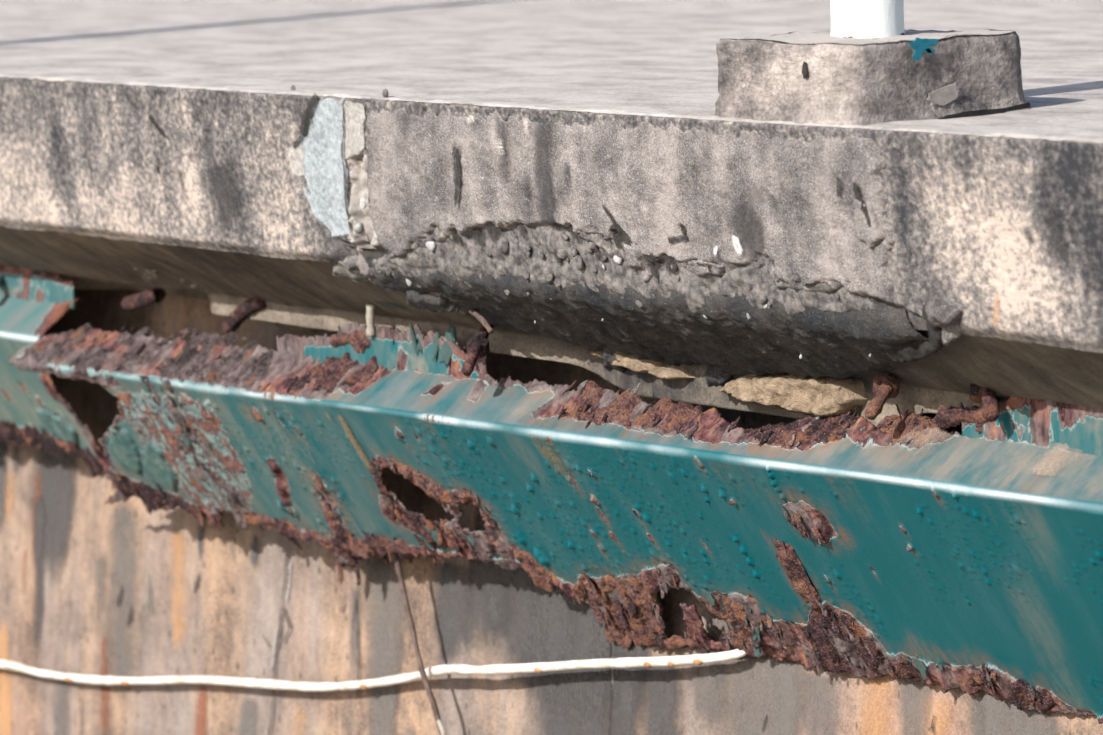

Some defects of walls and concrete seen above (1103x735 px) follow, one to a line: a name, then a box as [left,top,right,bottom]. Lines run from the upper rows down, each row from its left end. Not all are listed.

spalling [288,97,875,320]
peeling [853,198,886,249]
rust [0,323,498,586]
spalling [590,351,695,381]
spalling [717,374,869,417]
rust [728,406,860,448]
water stain [34,447,75,641]
water stain [351,554,403,735]
water stain [436,559,681,735]
rust [571,567,705,667]
rust [699,537,943,680]
water stain [970,690,1055,735]